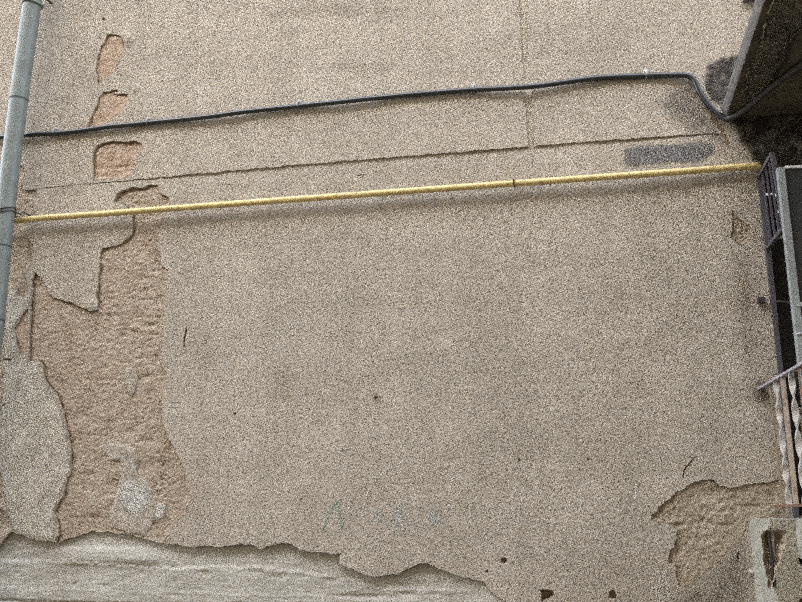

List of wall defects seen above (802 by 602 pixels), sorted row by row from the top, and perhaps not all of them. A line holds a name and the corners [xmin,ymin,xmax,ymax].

flaking render [87,34,129,127]
flaking render [92,140,142,180]
flaking render [730,210,755,247]
flaking render [0,165,506,602]
flaking render [650,479,791,591]